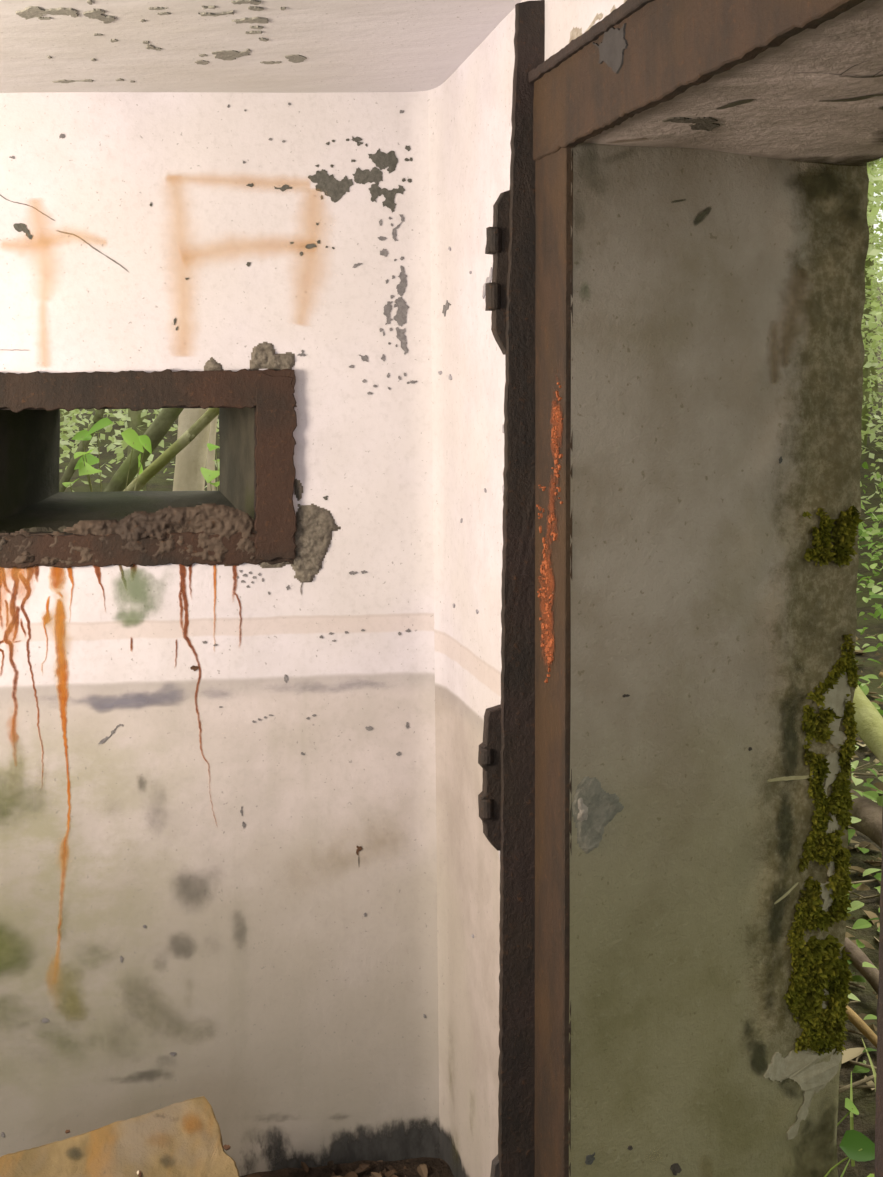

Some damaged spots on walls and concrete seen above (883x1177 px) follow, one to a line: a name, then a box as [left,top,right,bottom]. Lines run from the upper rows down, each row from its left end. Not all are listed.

peeling [15,0,118,43]
peeling [141,7,171,23]
peeling [195,0,307,65]
peeling [308,136,417,395]
spalling [237,479,341,595]
rust [536,382,564,683]
rust [93,565,106,609]
rust [232,565,242,641]
rust [175,564,210,776]
rust [0,566,74,896]
spalling [572,776,624,854]
leakage [266,1119,468,1177]